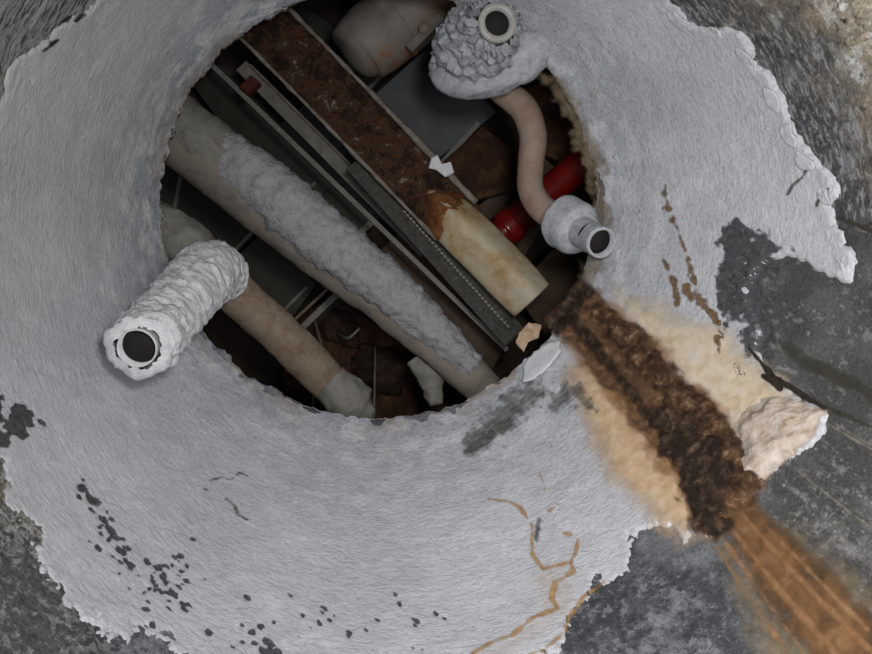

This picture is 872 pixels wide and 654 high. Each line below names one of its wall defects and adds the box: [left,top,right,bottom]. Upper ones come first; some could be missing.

peeling [829,226,847,277]
peeling [706,218,781,360]
crack [748,347,826,410]
peeling [0,395,46,448]
corrosion [546,184,872,654]
peeling [77,478,192,629]
peeling [230,621,282,654]